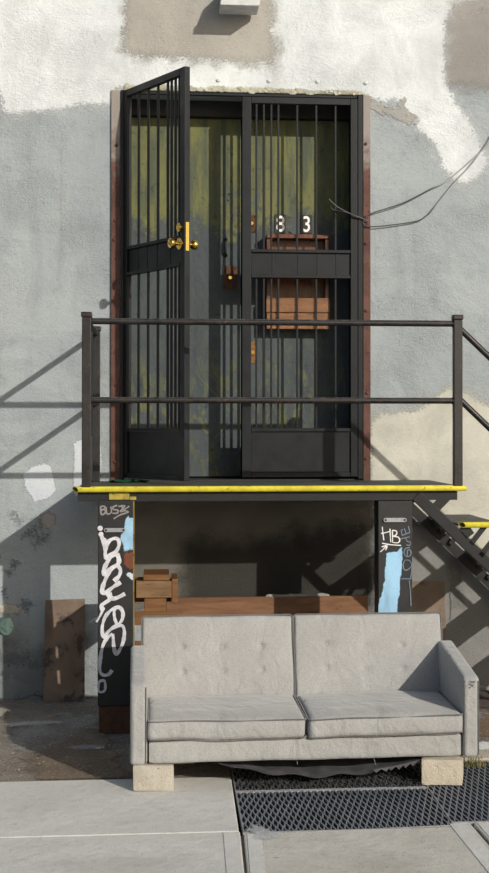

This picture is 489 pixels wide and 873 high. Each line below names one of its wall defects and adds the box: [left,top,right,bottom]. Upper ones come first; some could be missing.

flaking render [190,85,418,125]